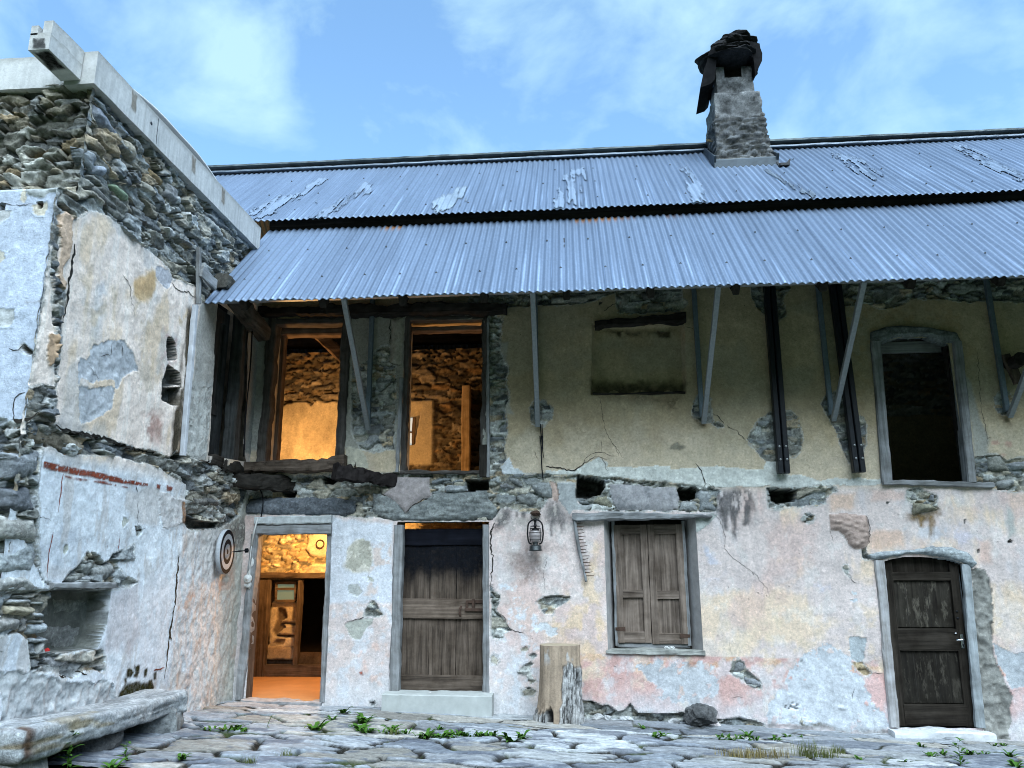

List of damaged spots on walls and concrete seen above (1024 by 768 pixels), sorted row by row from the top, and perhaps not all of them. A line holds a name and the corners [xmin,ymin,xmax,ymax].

spalling [106,215,150,252]
crack [63,244,76,318]
peeling [0,189,140,431]
peeling [155,261,191,289]
peeling [345,446,433,512]
spalling [466,479,490,492]
crack [535,402,622,473]
peeling [499,389,881,533]
leakage [719,498,750,536]
crack [164,557,179,678]
spalling [490,584,512,640]
peeling [971,548,1024,741]